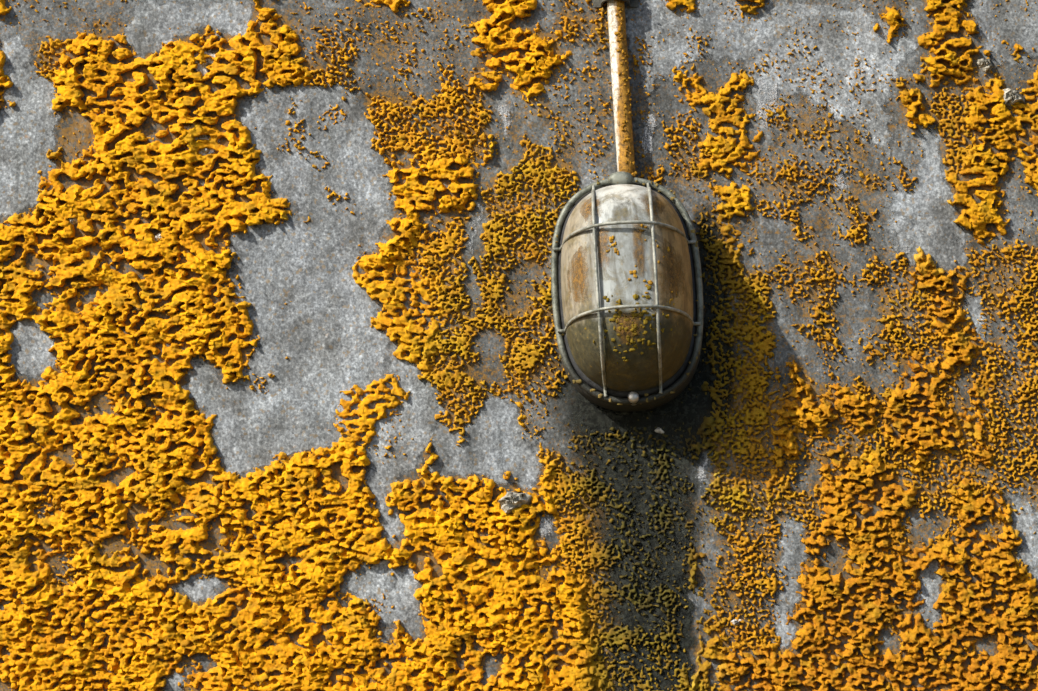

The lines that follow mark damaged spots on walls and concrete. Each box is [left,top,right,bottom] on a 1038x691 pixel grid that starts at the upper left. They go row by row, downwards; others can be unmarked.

damp [555,212,733,691]